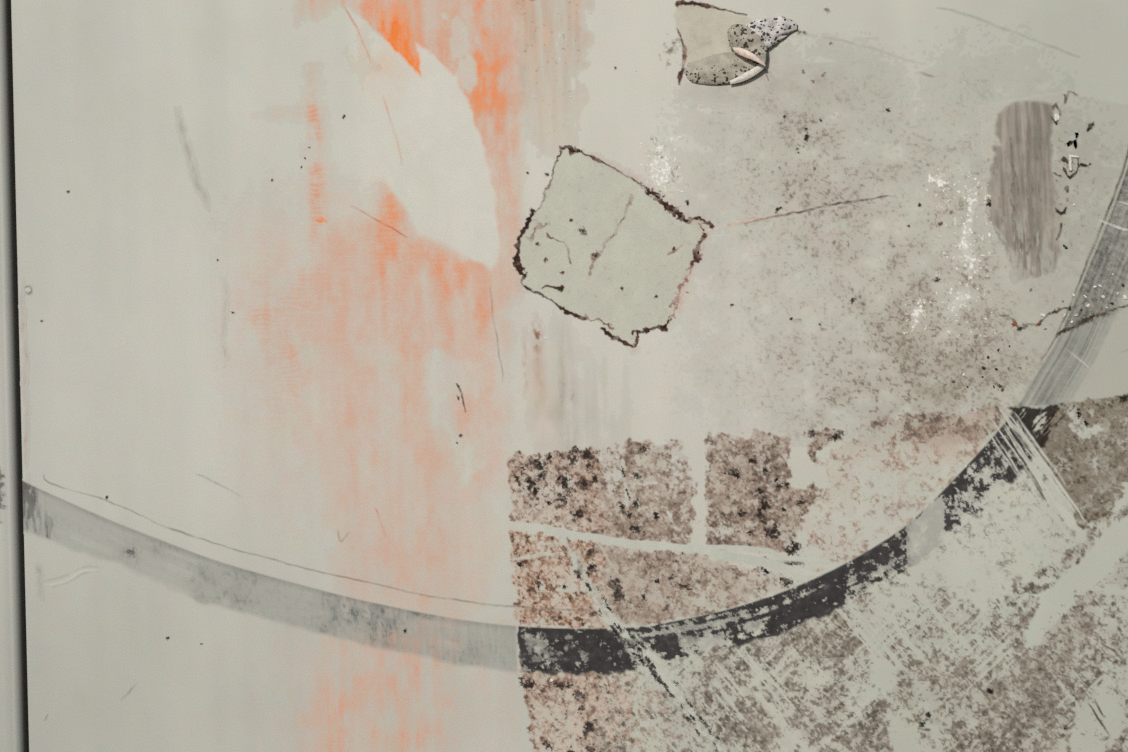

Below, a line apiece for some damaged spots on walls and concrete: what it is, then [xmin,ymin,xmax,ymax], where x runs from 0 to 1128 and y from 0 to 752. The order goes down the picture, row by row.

rust [509,0,595,160]
peeling [658,0,859,116]
peeling [512,144,715,355]
rust [521,311,552,453]